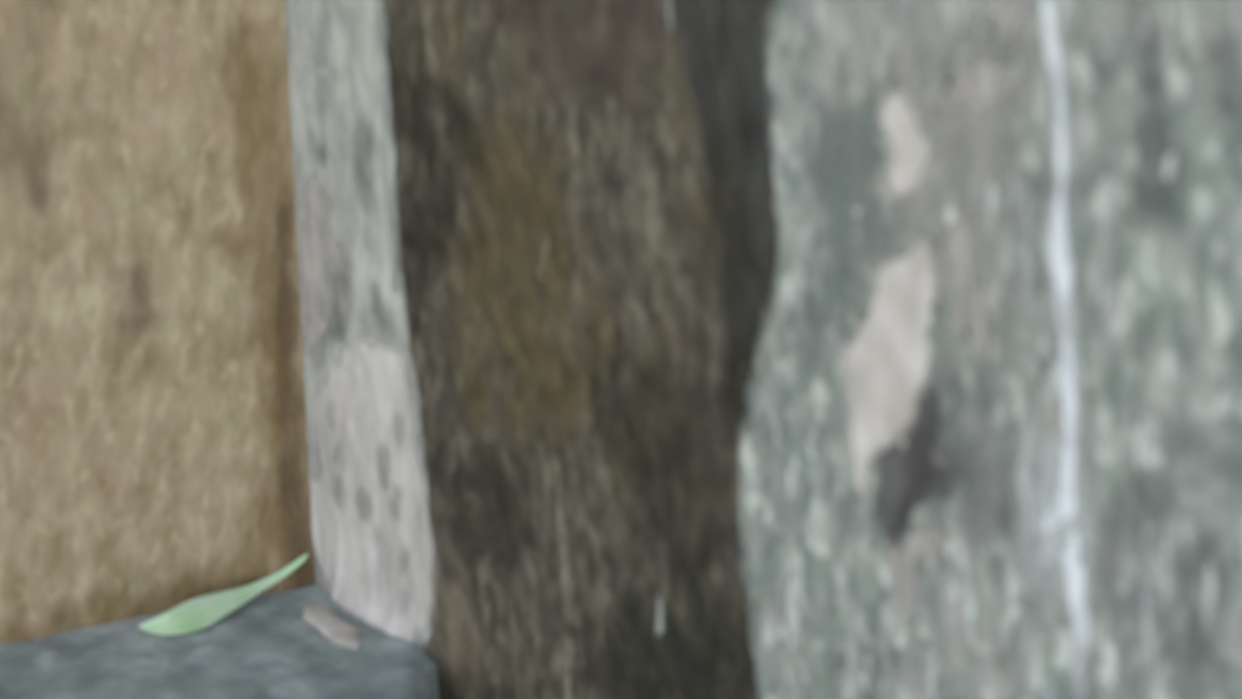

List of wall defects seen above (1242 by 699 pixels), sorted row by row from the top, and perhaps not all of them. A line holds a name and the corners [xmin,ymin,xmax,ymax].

peeling [877,76,930,195]
peeling [845,236,954,624]
water stain [1018,0,1090,680]